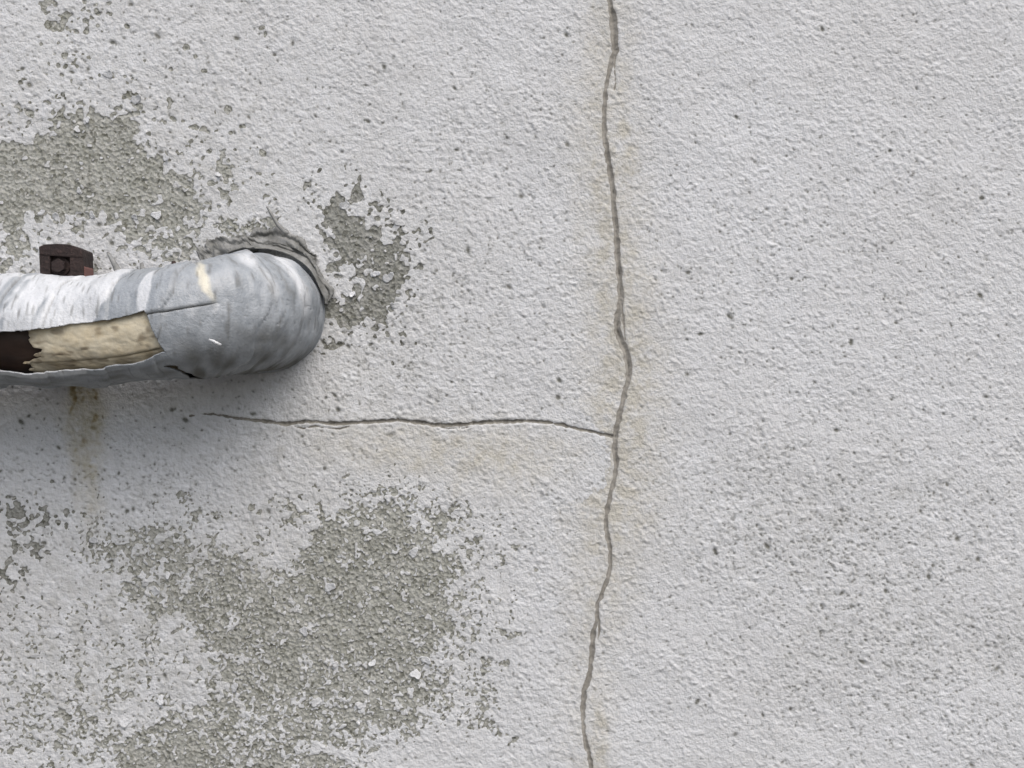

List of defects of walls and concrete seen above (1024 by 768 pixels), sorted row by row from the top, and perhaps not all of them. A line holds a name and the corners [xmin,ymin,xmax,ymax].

peeling [0,0,281,274]
peeling [303,165,434,355]
crack [189,0,632,768]
peeling [0,463,522,768]